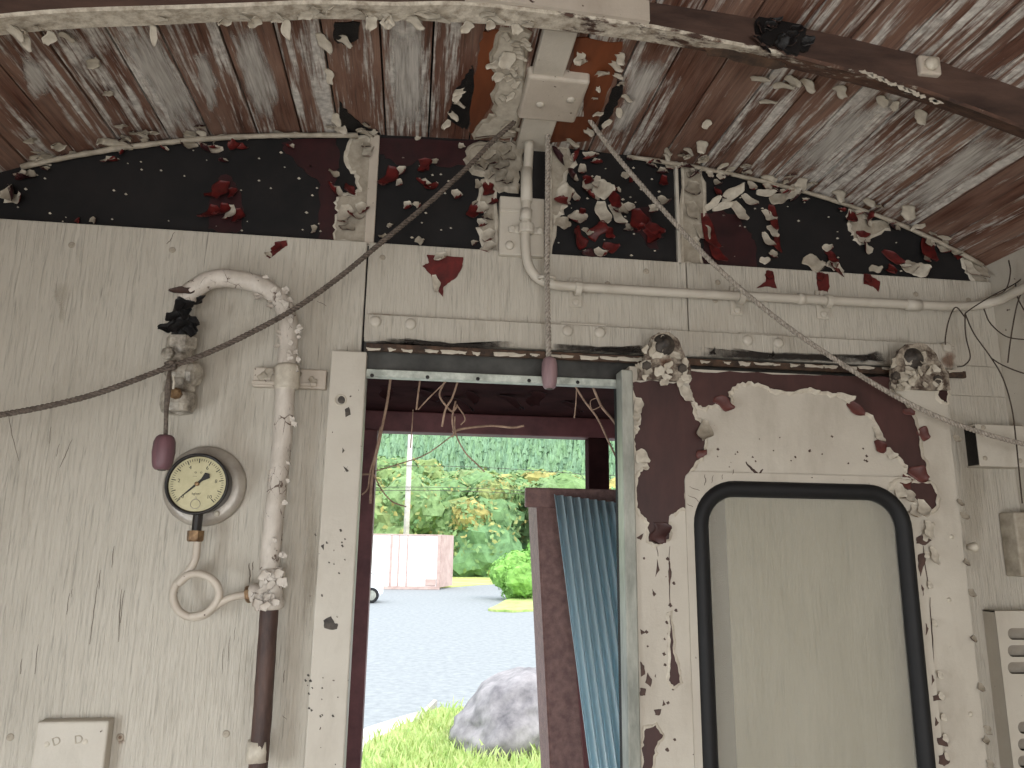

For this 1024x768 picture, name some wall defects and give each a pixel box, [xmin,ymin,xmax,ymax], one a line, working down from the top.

peeling [0,137,77,208]
peeling [6,24,77,96]
peeling [180,125,260,233]
peeling [217,5,337,116]
peeling [273,9,534,252]
peeling [410,236,463,296]
peeling [550,37,818,288]
peeling [802,142,999,293]
peeling [859,70,944,125]
peeling [494,335,963,596]
peeling [252,537,288,612]
peeling [640,603,683,768]